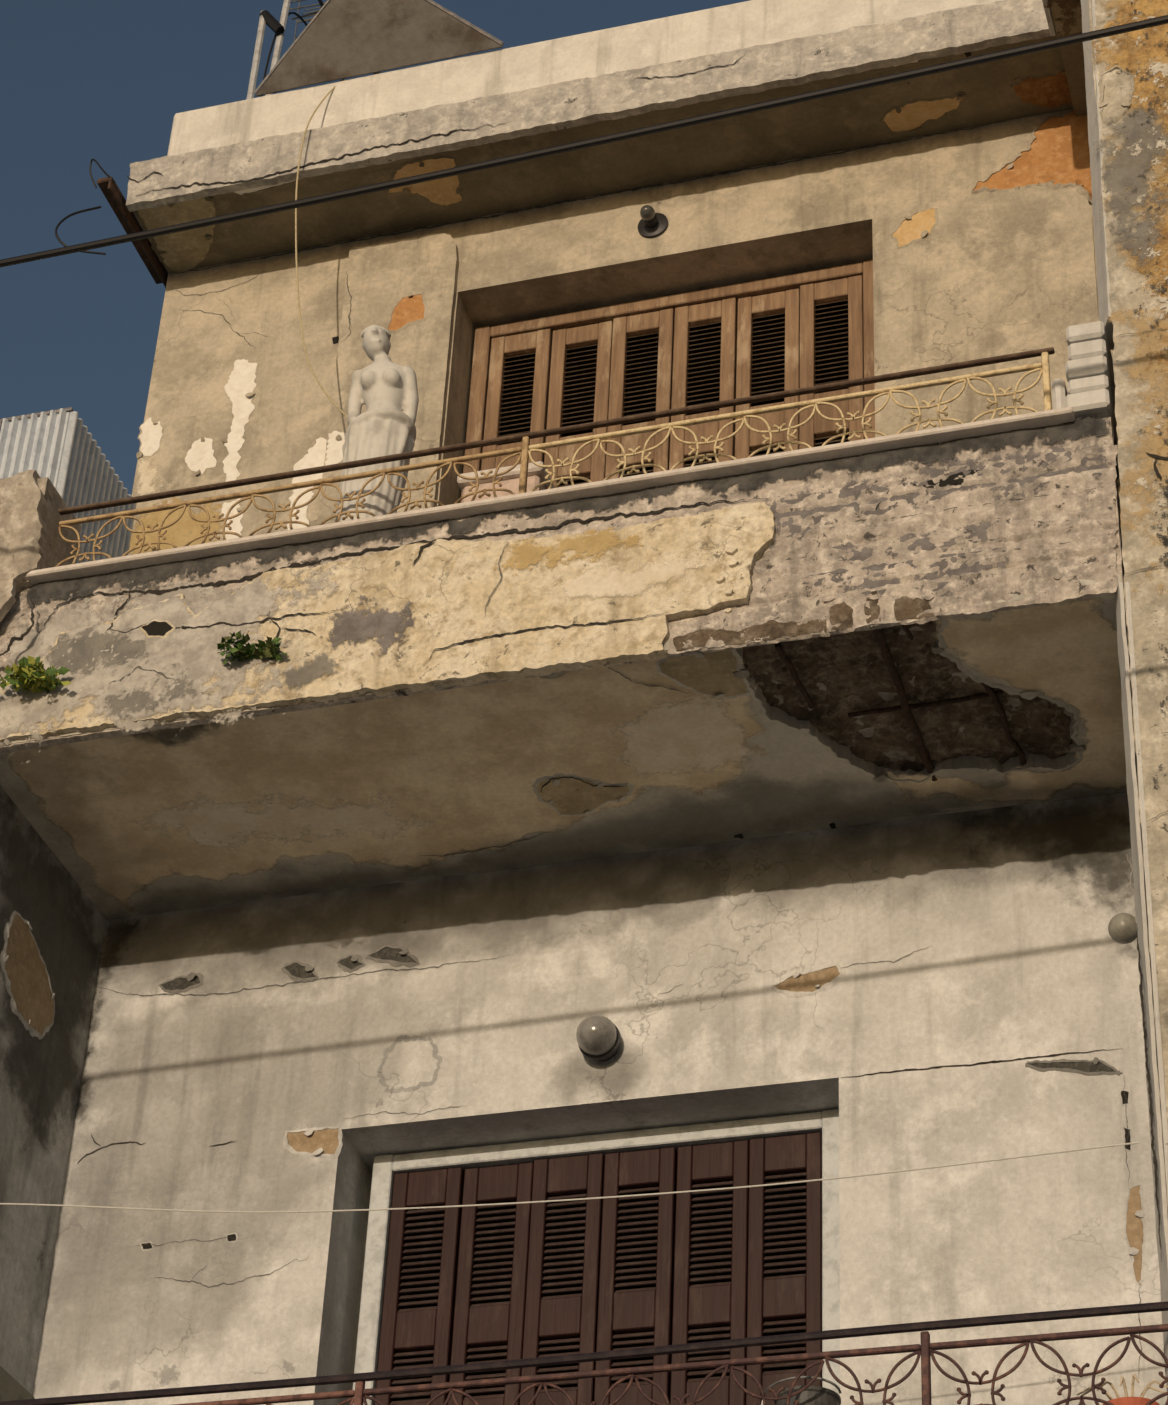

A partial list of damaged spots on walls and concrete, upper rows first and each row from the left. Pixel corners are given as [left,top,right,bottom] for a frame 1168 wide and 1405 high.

water stain [1113,0,1168,380]
peeling [136,417,165,460]
peeling [184,358,259,540]
spalling [655,0,1168,783]
water stain [1131,399,1168,566]
crack [0,497,771,667]
crack [109,666,175,684]
water stain [0,414,1139,1141]
spalling [0,910,55,1039]
spalling [770,963,844,998]
spalling [283,1126,343,1159]
peeling [1124,1183,1147,1285]